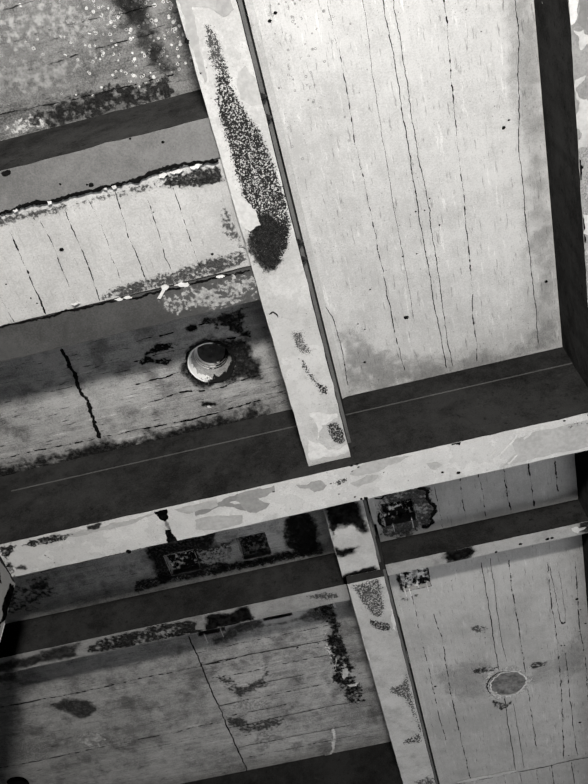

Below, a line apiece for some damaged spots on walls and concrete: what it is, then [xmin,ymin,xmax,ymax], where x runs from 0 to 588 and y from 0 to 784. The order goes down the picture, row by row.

leakage [0,0,192,134]
peeling [569,0,588,50]
peeling [574,76,588,149]
leakage [76,166,225,204]
leakage [102,25,292,389]
crack [362,0,453,368]
crack [515,0,539,343]
crack [1,348,260,459]
peeling [307,411,349,460]
peeling [350,455,412,500]
leakage [134,513,324,592]
crack [412,558,588,784]